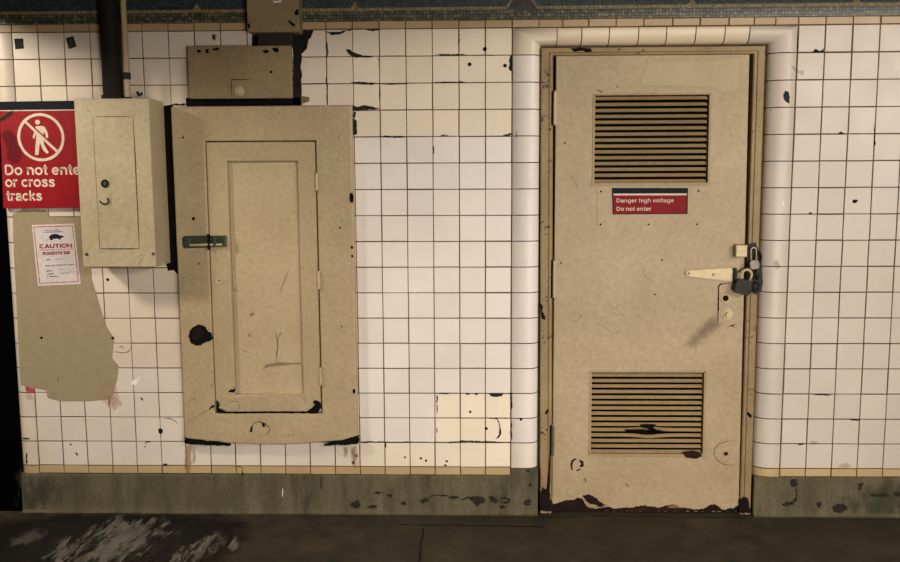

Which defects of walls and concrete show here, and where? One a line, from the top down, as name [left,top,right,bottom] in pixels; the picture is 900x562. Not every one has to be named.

spalling [352,105,379,135]
spalling [421,495,510,509]